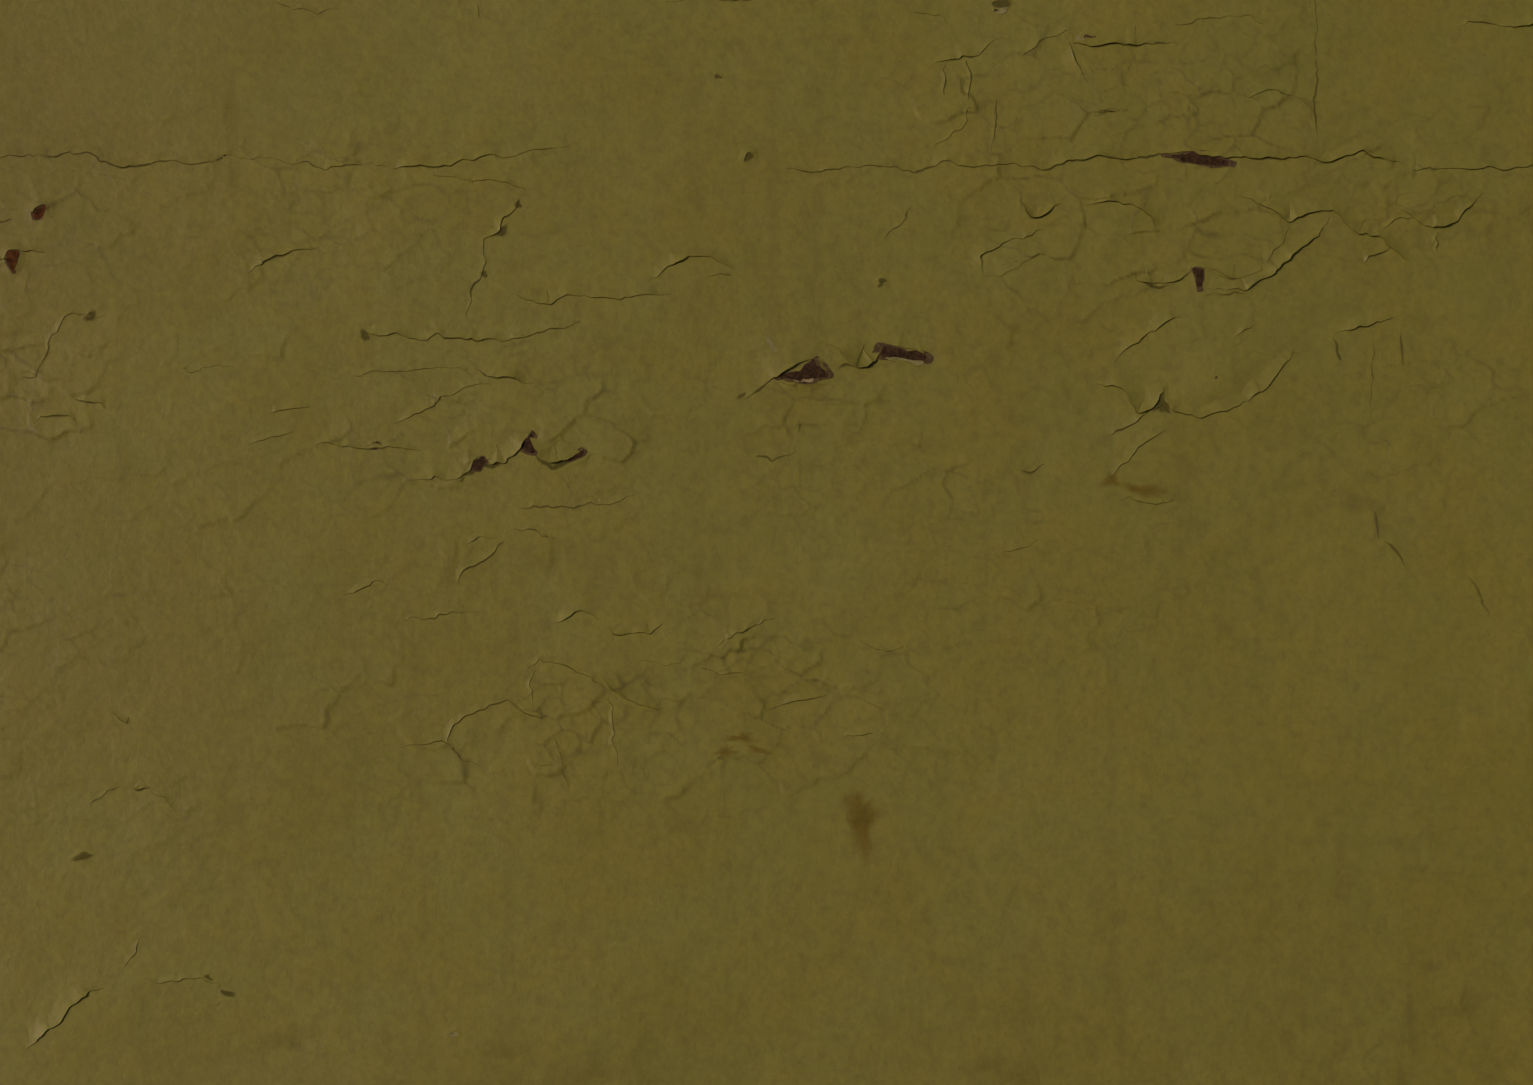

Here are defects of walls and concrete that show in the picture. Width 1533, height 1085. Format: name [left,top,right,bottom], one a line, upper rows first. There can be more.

peeling [739,330,933,400]
peeling [412,429,592,481]